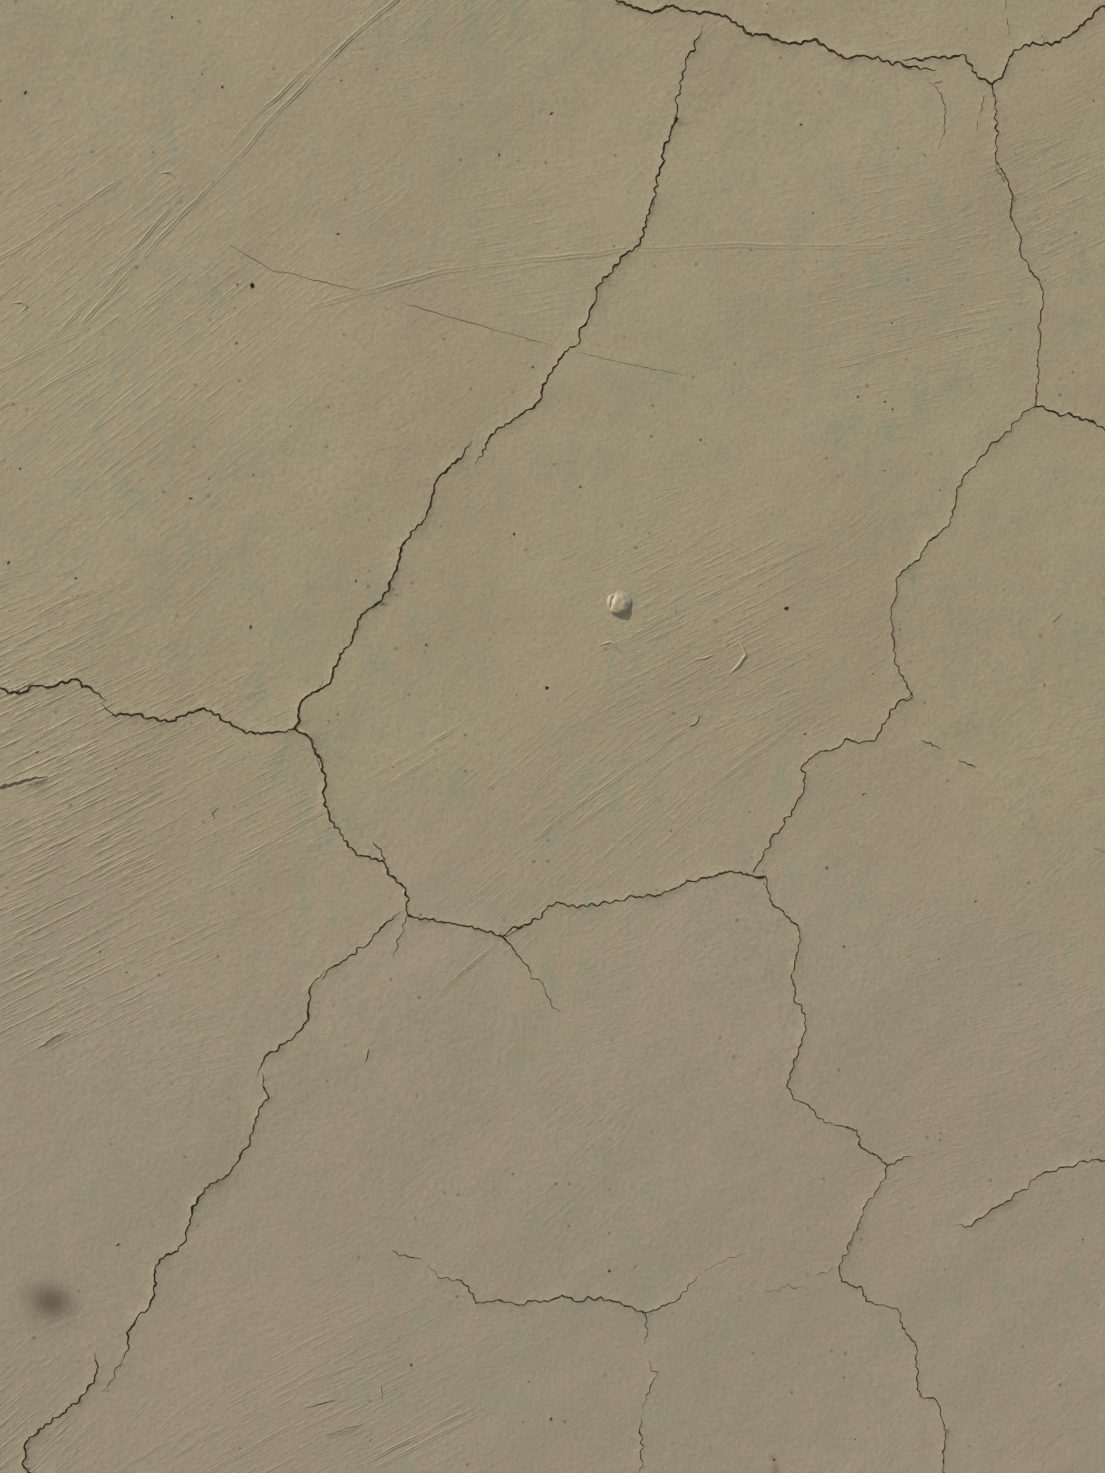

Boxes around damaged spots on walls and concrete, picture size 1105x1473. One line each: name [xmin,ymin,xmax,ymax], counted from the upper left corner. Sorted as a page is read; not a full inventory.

crack [615,0,936,71]
crack [230,245,361,291]
crack [475,25,703,463]
crack [401,302,549,345]
crack [753,5,1105,873]
crack [0,678,105,700]
crack [101,441,947,1473]
crack [959,1159,1105,1228]
crack [22,1351,99,1473]